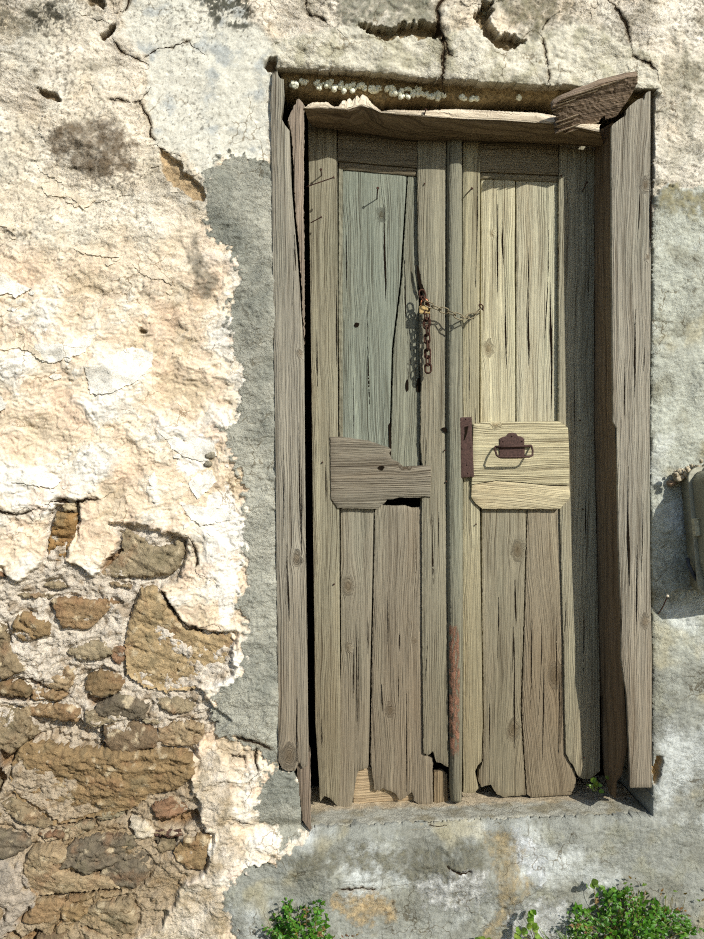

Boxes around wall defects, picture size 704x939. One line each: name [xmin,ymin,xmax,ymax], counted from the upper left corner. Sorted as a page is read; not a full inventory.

crack [80,0,204,175]
crack [434,0,457,95]
crack [509,11,560,85]
crack [590,0,659,79]
crack [0,495,107,522]